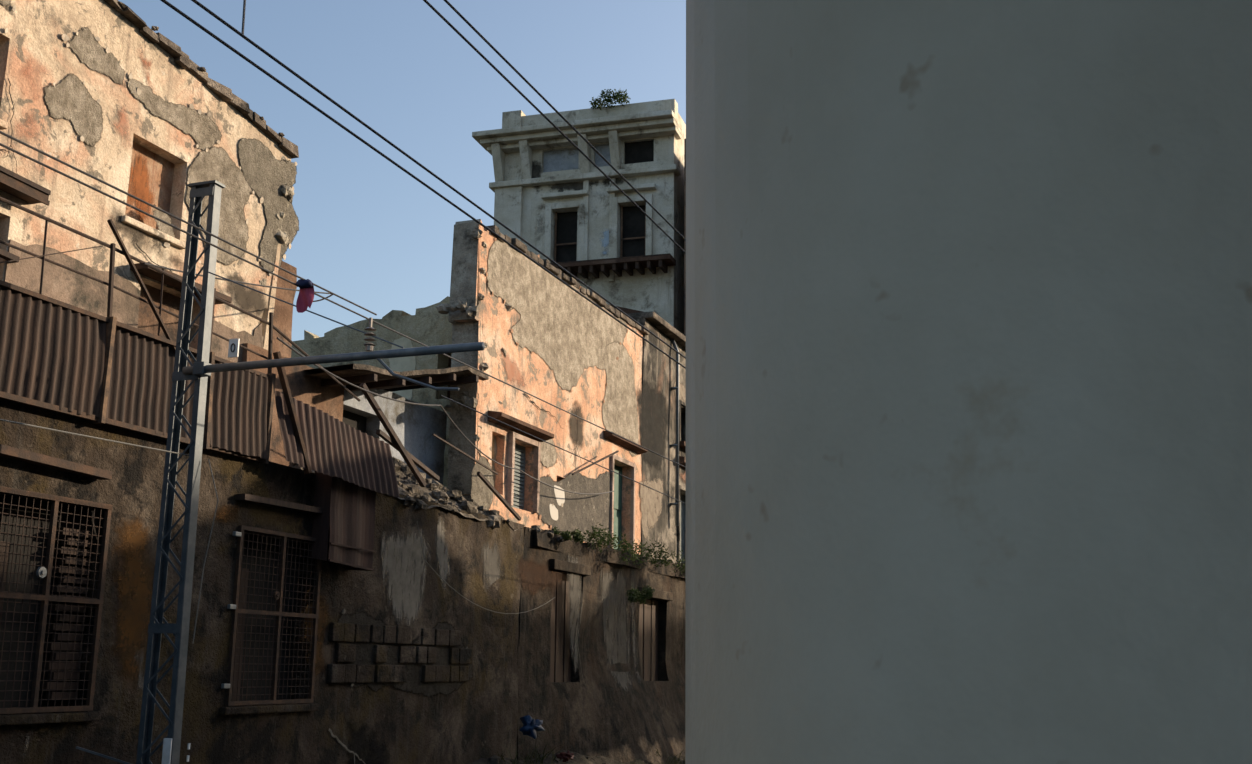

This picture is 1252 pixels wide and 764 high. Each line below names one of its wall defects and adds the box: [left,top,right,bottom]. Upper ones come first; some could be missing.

flaking render [44,27,299,285]
flaking render [436,227,639,457]
leakage [381,517,450,627]
flaking render [538,439,611,545]